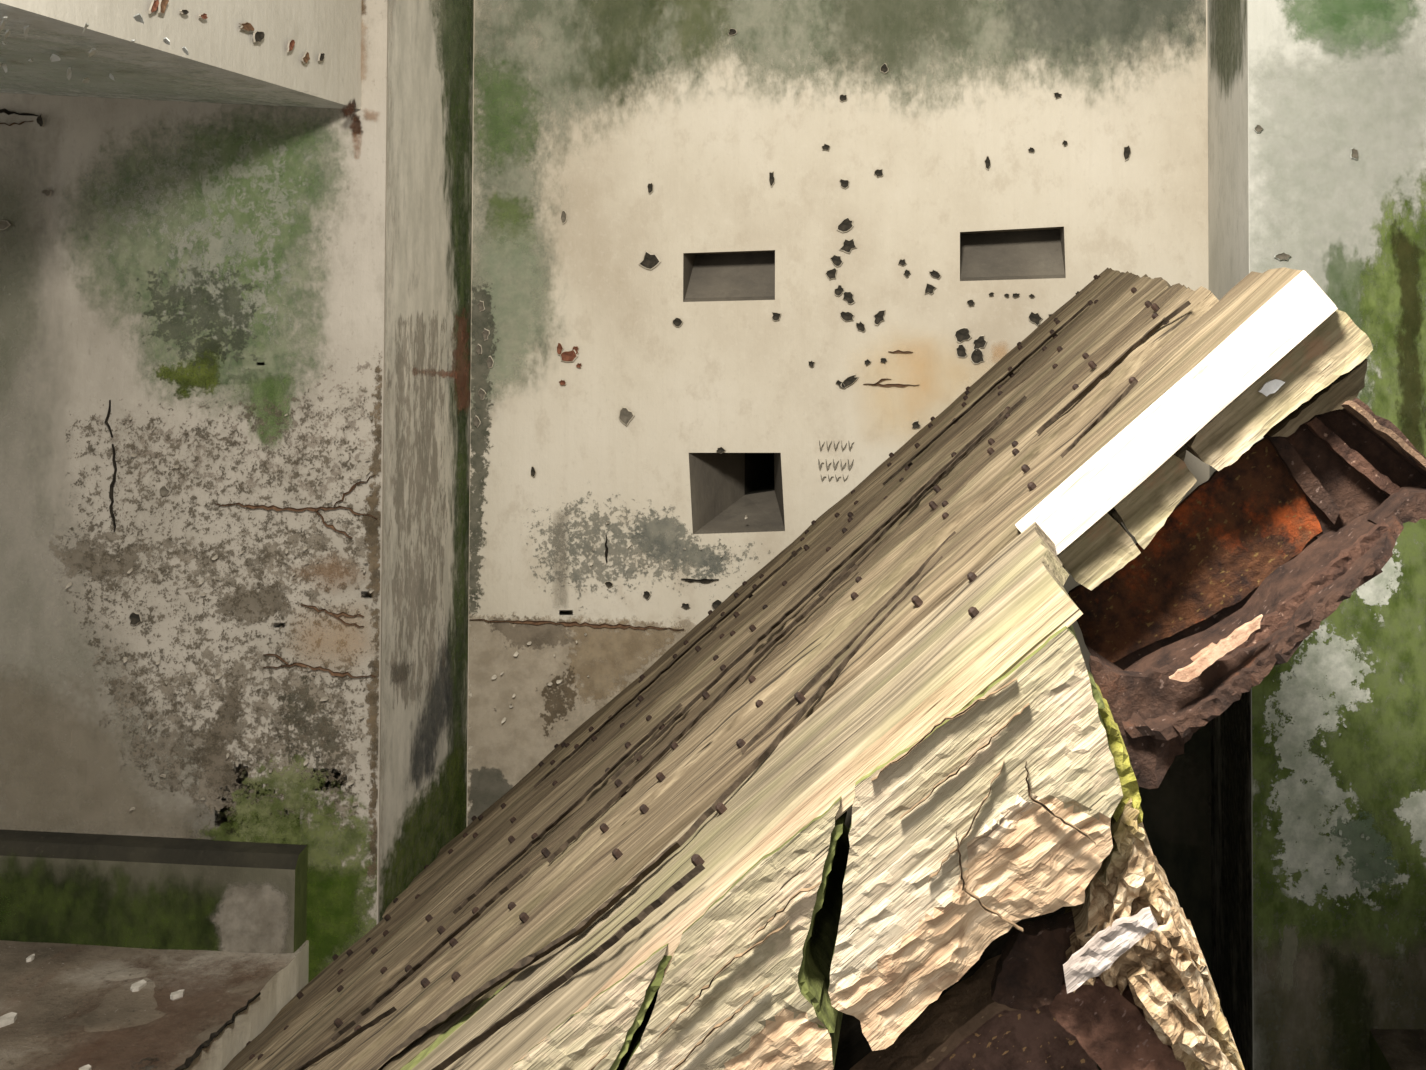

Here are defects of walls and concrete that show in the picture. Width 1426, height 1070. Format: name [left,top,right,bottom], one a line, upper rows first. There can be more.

leakage [585,0,661,104]
crack [0,108,39,126]
rust [342,100,372,149]
leakage [248,377,293,444]
rust [413,309,471,413]
crack [105,400,117,532]
leakage [0,138,235,838]
peeling [49,353,382,879]
leakage [1138,691,1426,1070]
crack [175,992,261,1070]